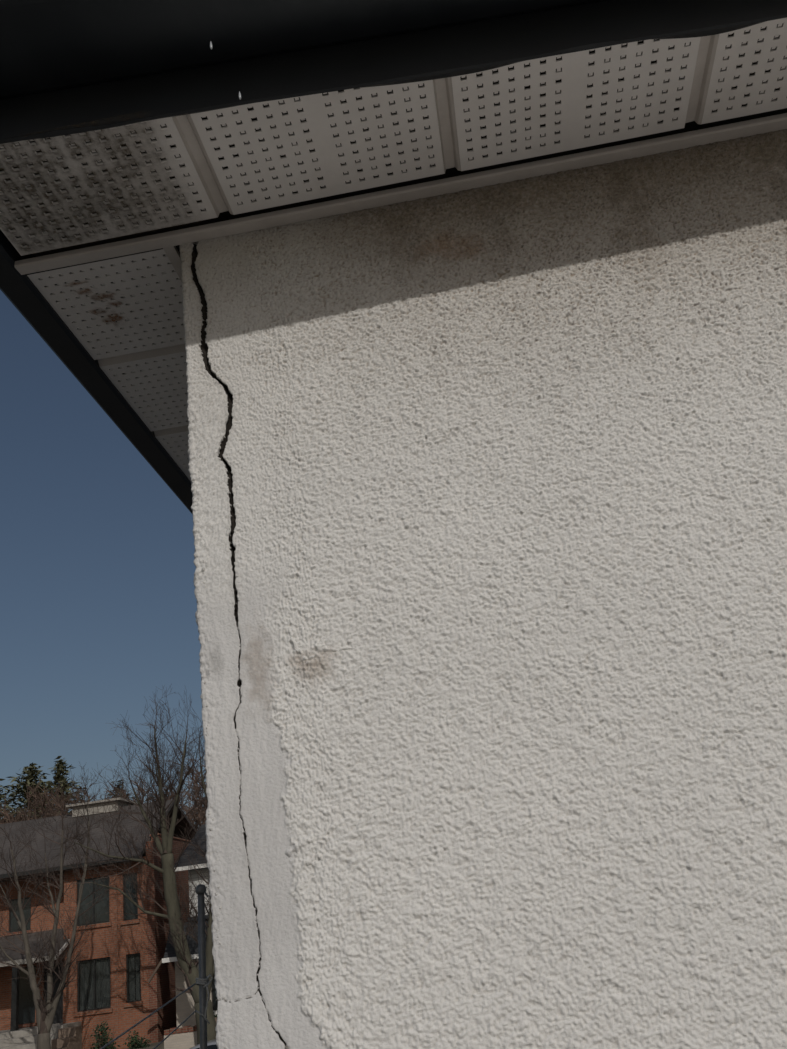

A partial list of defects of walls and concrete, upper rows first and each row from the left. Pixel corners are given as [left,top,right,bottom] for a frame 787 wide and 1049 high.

damp [0,121,191,251]
crack [191,244,286,1046]